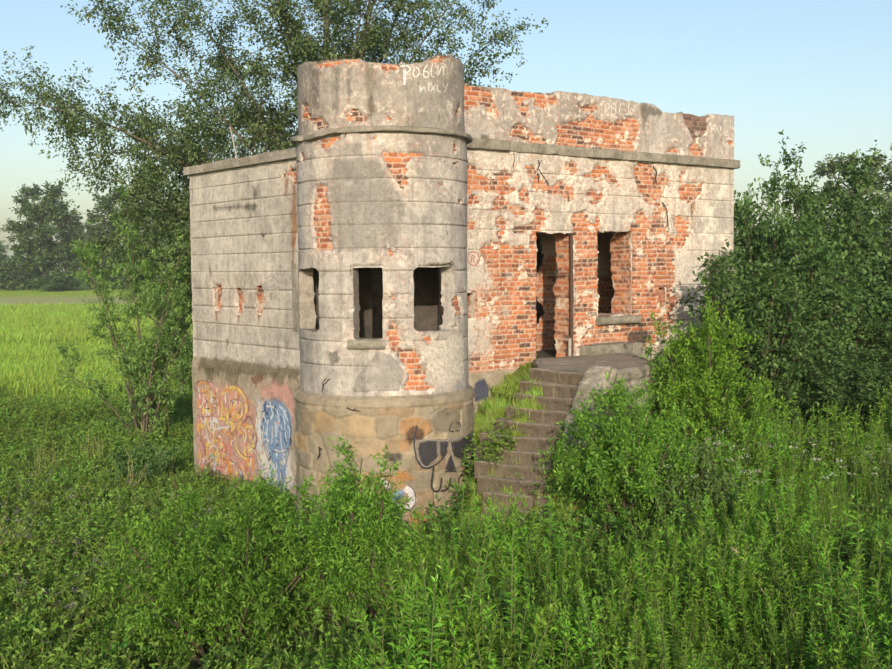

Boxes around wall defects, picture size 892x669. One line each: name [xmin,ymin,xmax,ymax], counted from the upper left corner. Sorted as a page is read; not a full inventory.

spalling [303,104,347,150]
spalling [345,105,367,124]
spalling [455,85,498,122]
spalling [505,90,639,151]
spalling [682,113,714,157]
spalling [382,152,425,189]
spalling [313,184,334,250]
spalling [453,144,702,373]
spalling [451,291,460,327]
spalling [386,322,433,391]